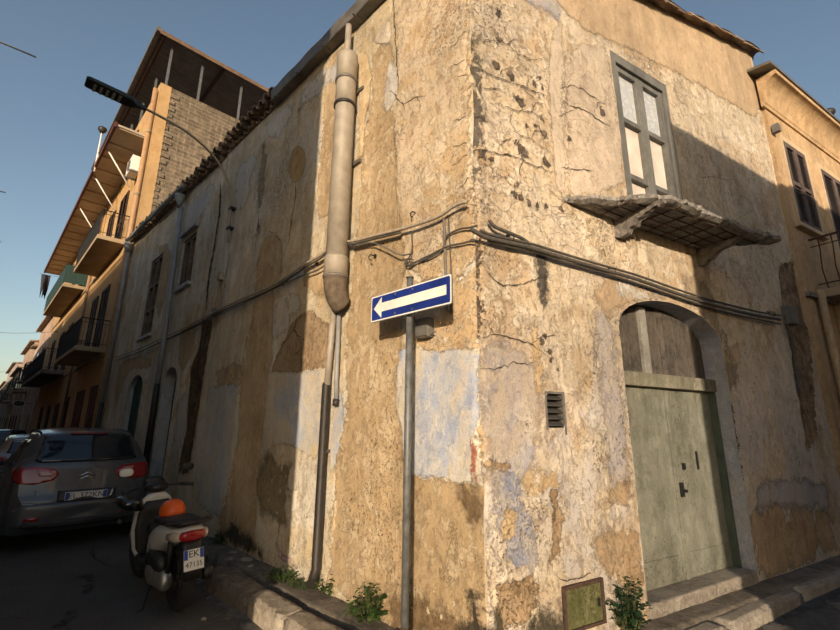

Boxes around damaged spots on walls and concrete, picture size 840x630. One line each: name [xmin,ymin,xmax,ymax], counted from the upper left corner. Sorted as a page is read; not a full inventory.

flaking render [267,46,344,220]
crack [389,0,421,111]
crack [450,31,614,188]
flaking render [527,0,761,213]
peeling [172,394,188,467]
crack [205,184,221,314]
flaking render [195,235,329,553]
flaking render [326,0,566,630]
crack [479,320,558,370]
spalling [594,200,757,248]